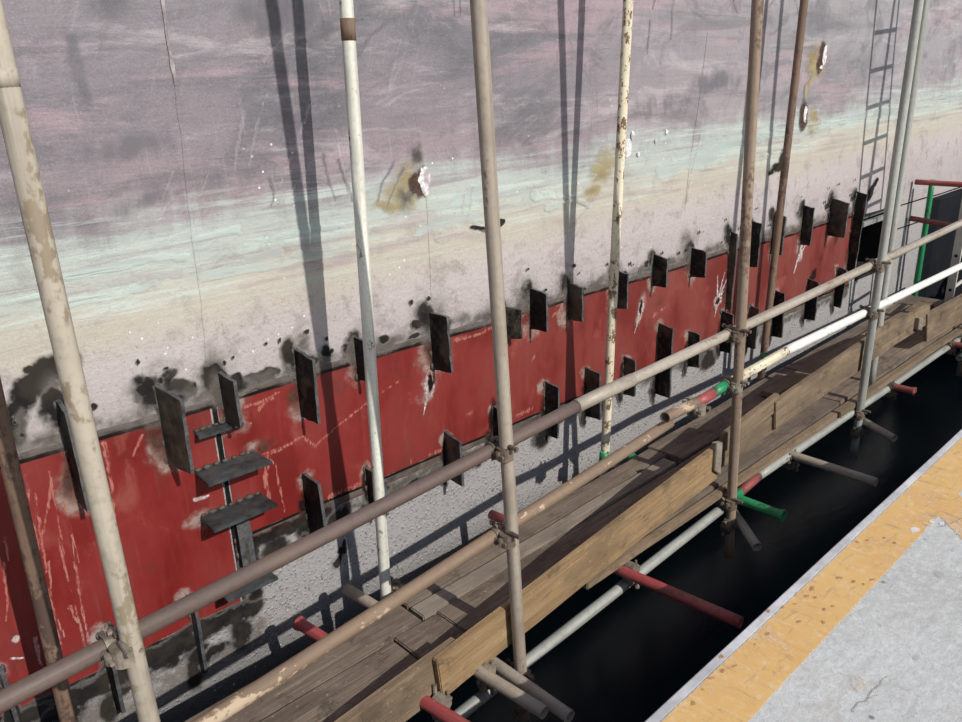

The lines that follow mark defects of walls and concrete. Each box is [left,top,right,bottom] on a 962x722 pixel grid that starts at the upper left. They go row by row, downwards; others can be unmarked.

rust [800,41,827,133]
rust [376,148,431,213]